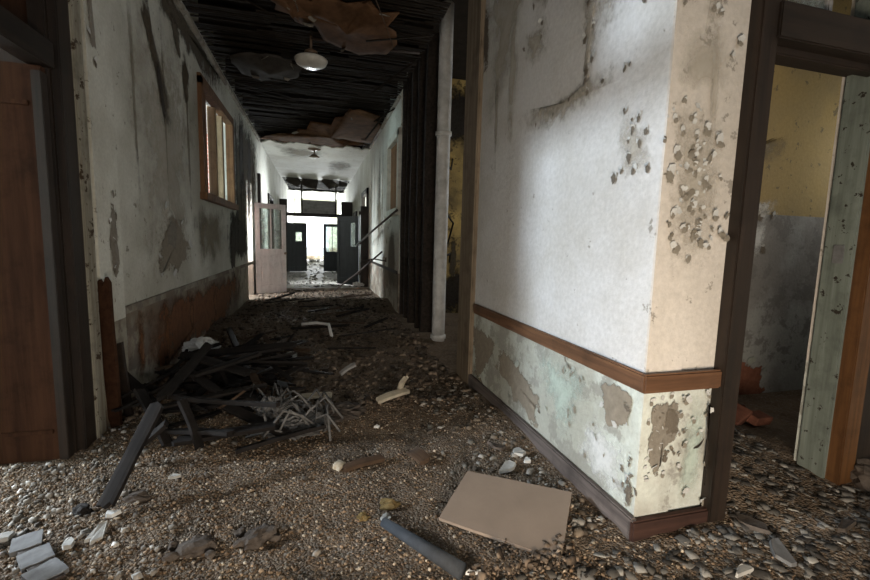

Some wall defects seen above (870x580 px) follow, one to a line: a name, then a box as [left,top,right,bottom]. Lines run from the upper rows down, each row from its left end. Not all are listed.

damp [129,0,220,229]
damp [199,123,257,274]
flaking render [260,108,382,147]
flaking render [271,0,400,55]
peeling [533,0,612,128]
peeling [611,107,650,184]
peeling [663,96,730,264]
flaking render [738,357,766,395]
flaking render [583,382,637,507]
flaking render [643,390,714,497]